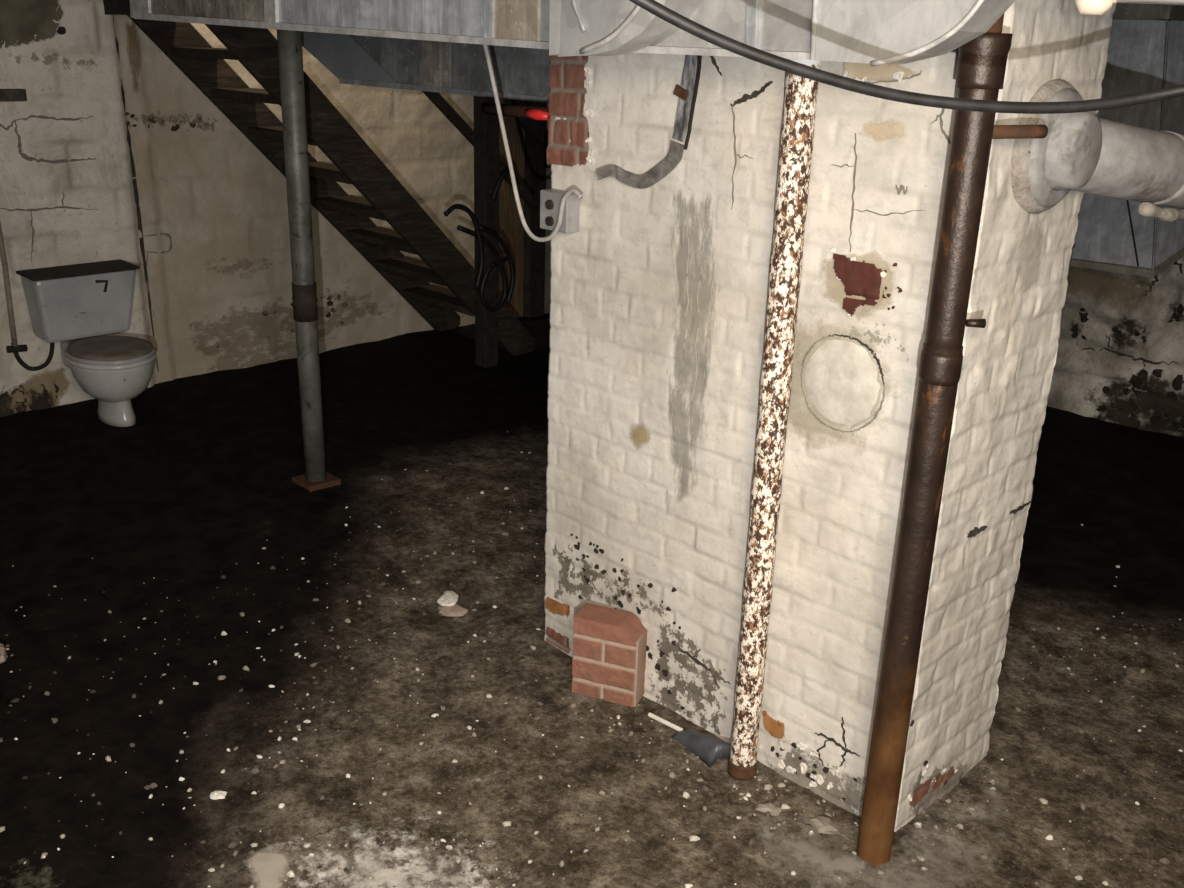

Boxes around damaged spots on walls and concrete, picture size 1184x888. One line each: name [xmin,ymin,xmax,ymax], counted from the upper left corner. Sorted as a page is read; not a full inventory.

flaking render [547,55,595,167]
water stain [0,368,69,417]
water stain [669,194,716,497]
spalling [824,248,906,352]
water stain [1089,369,1184,438]
water stain [552,533,727,738]
corrosion [762,711,784,739]
crack [814,717,860,767]